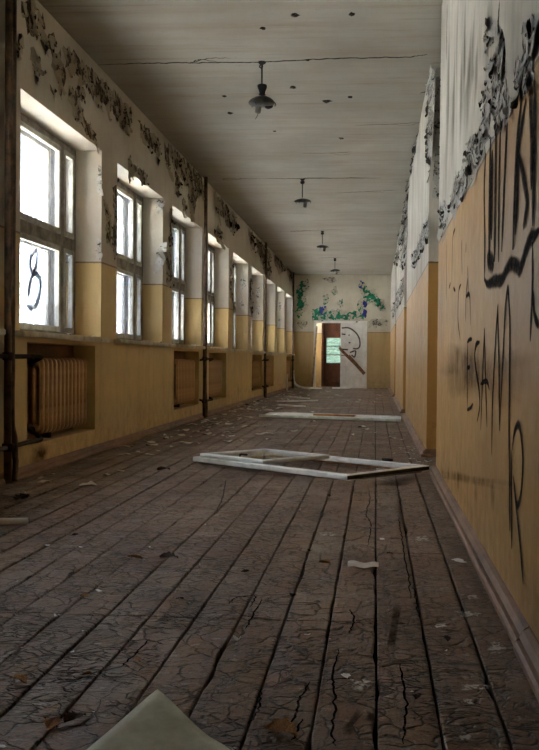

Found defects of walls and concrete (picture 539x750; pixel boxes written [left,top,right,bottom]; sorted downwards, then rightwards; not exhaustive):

crack [105,54,427,65]
peeling [17,0,205,225]
peeling [214,13,539,328]
crack [229,595,266,629]
crack [393,516,432,618]
crack [248,650,353,746]
crack [399,665,429,744]